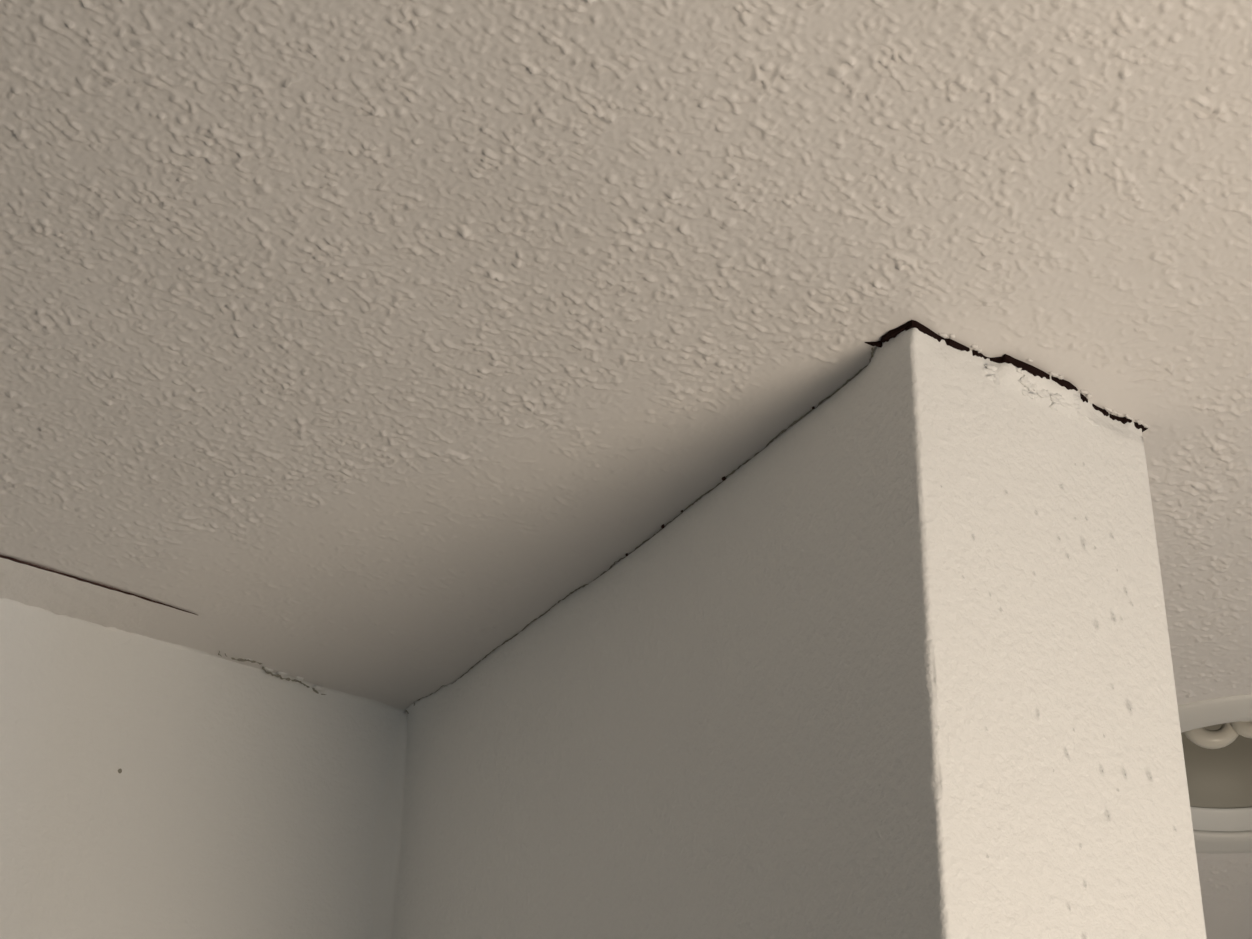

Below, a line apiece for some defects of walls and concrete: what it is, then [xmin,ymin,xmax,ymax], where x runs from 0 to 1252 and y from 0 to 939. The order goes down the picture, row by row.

crack [406,320,1151,714]
crack [0,555,197,615]
crack [218,651,326,695]